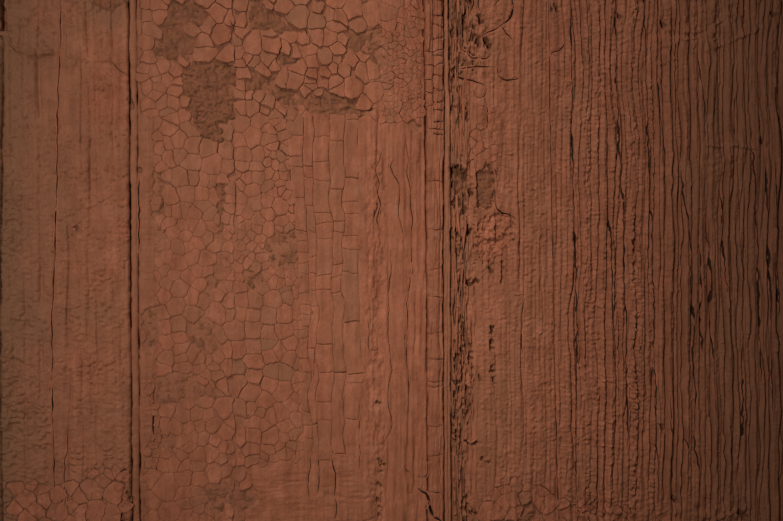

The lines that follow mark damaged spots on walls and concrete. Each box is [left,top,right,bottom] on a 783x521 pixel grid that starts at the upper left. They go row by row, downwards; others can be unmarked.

peeling [136,0,384,144]
crack [137,0,519,521]
spalling [475,162,515,264]
crack [547,0,620,521]
crack [605,0,630,450]
crack [642,0,729,505]
crack [735,129,779,483]